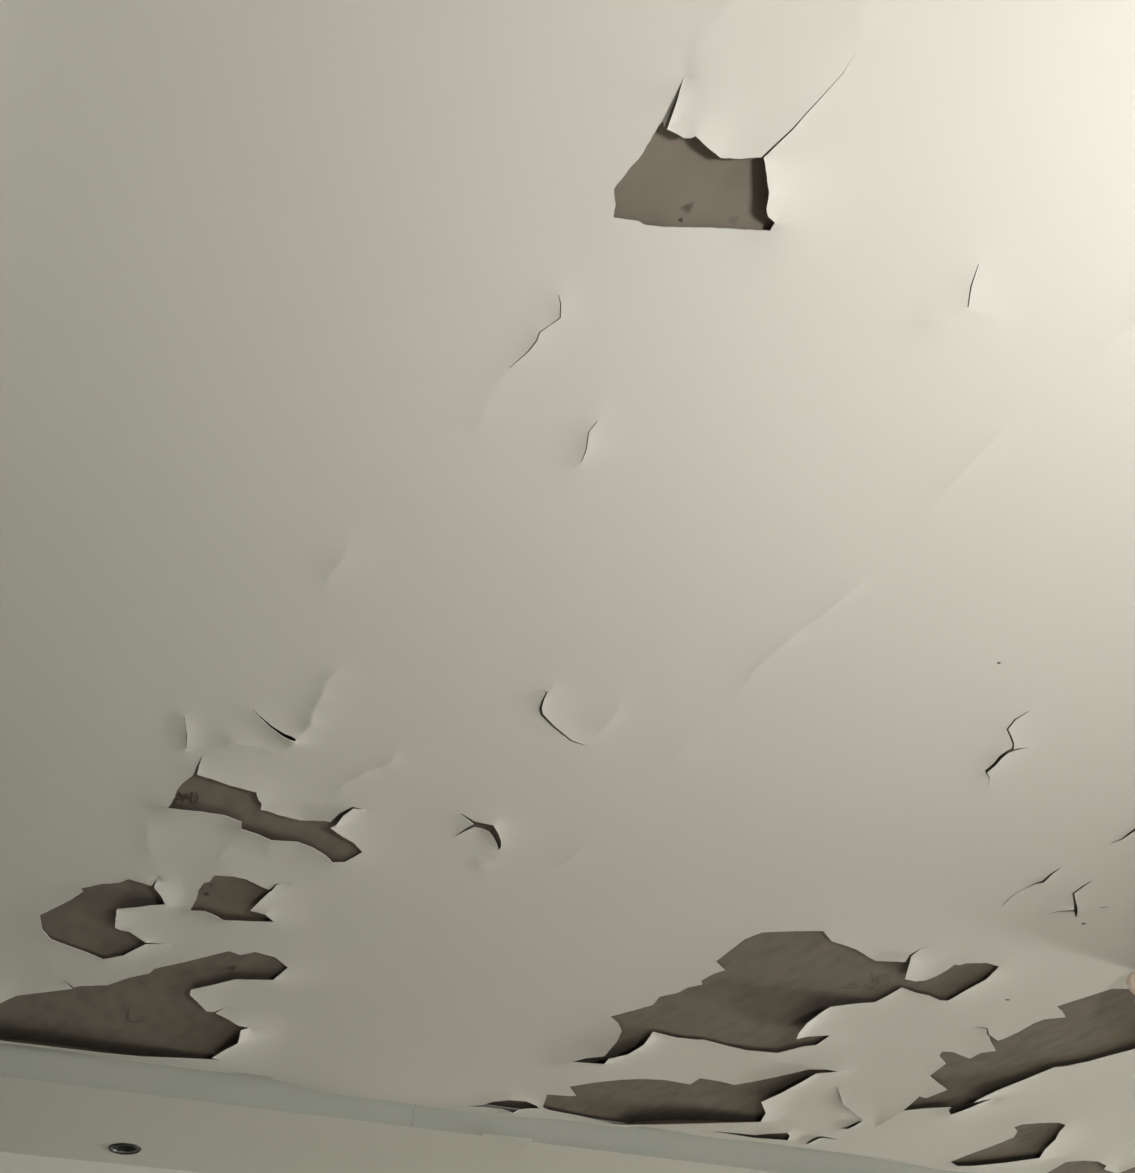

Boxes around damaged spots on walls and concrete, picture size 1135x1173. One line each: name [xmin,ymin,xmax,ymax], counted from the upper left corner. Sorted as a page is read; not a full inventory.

peeling [606,0,885,264]
crack [969,708,1040,791]
peeling [146,752,378,873]
crack [449,811,516,870]
crack [999,866,1097,919]
crack [1107,823,1135,846]
peeling [0,869,317,1069]
peeling [438,923,1135,1173]